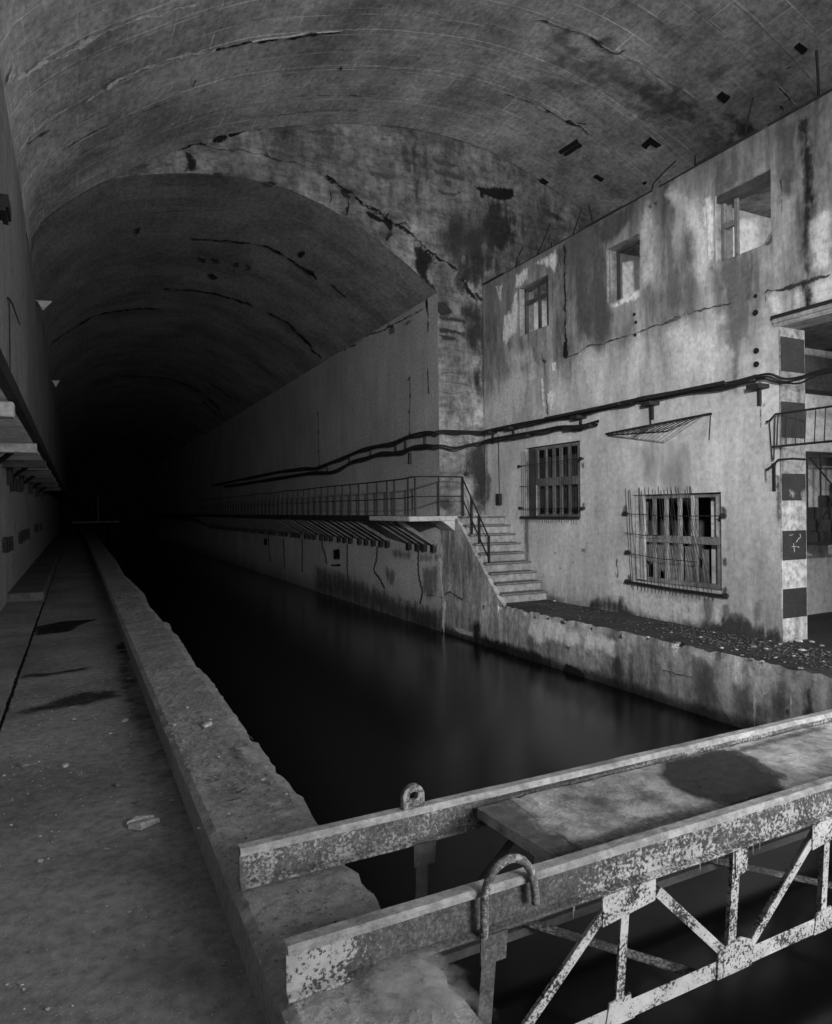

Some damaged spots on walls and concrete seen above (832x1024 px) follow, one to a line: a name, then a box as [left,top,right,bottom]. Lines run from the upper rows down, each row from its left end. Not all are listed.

crack [23,32,340,151]
crack [538,20,695,98]
leakage [779,119,814,249]
crack [326,175,483,301]
leakage [444,204,515,288]
crack [51,288,429,358]
crack [542,245,732,415]
crack [765,274,831,302]
leakage [473,617,633,684]
leakage [590,598,635,615]
leakage [702,602,780,642]
leakage [662,727,826,804]